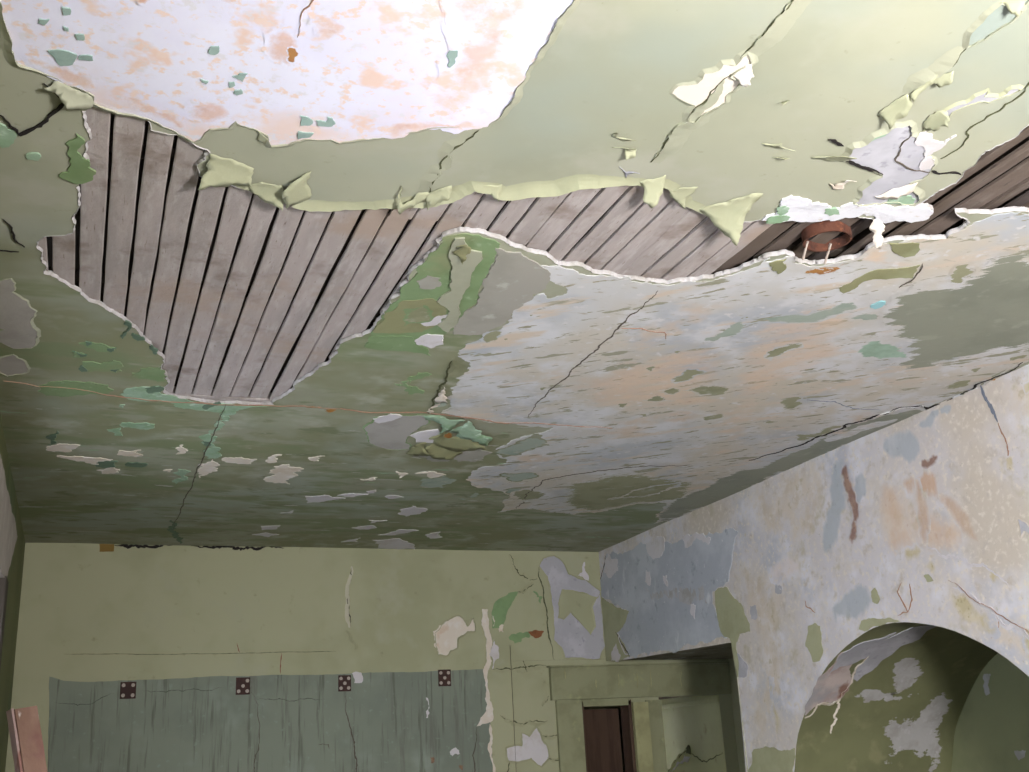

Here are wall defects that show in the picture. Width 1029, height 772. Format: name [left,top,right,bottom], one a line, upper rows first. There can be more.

crack [0,81,96,184]
crack [651,0,813,163]
crack [0,219,25,252]
peeling [0,0,1029,514]
peeling [252,525,280,537]
crack [5,361,612,551]
peeling [305,477,442,549]
peeling [533,528,738,662]
crack [656,362,1023,523]
crack [897,582,913,616]
peeling [433,591,550,772]
peeling [805,625,957,772]